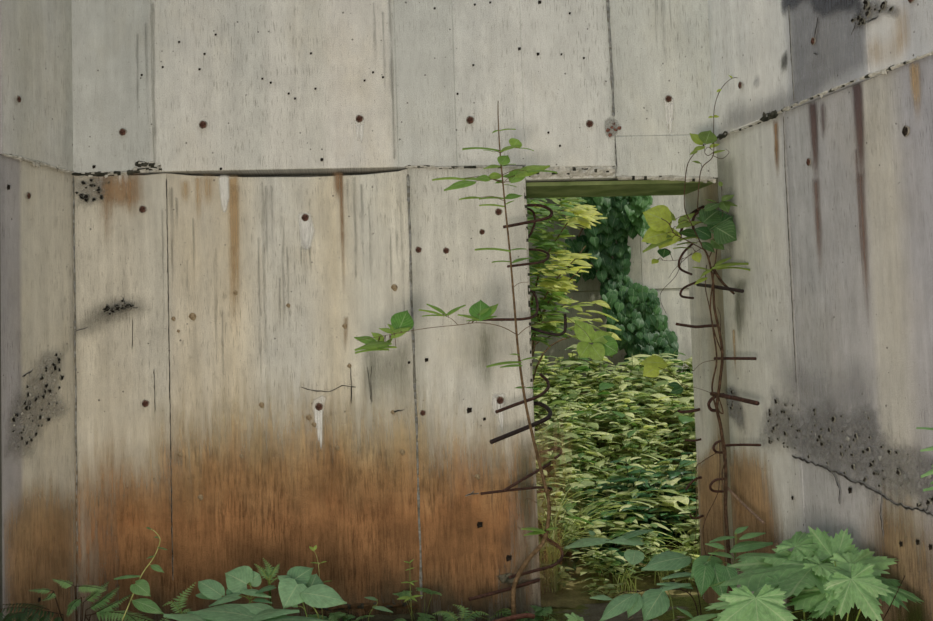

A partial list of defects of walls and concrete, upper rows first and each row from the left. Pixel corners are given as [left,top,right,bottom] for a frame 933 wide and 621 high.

spalling [851,0,894,26]
corrosion [806,103,824,166]
spalling [72,161,162,203]
corrosion [229,178,237,252]
corrosion [335,174,344,240]
corrosion [853,84,866,277]
spalling [102,300,134,315]
spalling [10,353,64,448]
efflorescence [312,396,326,446]
efflorescence [493,394,505,430]
spalling [677,388,933,508]
corrosion [697,437,779,574]